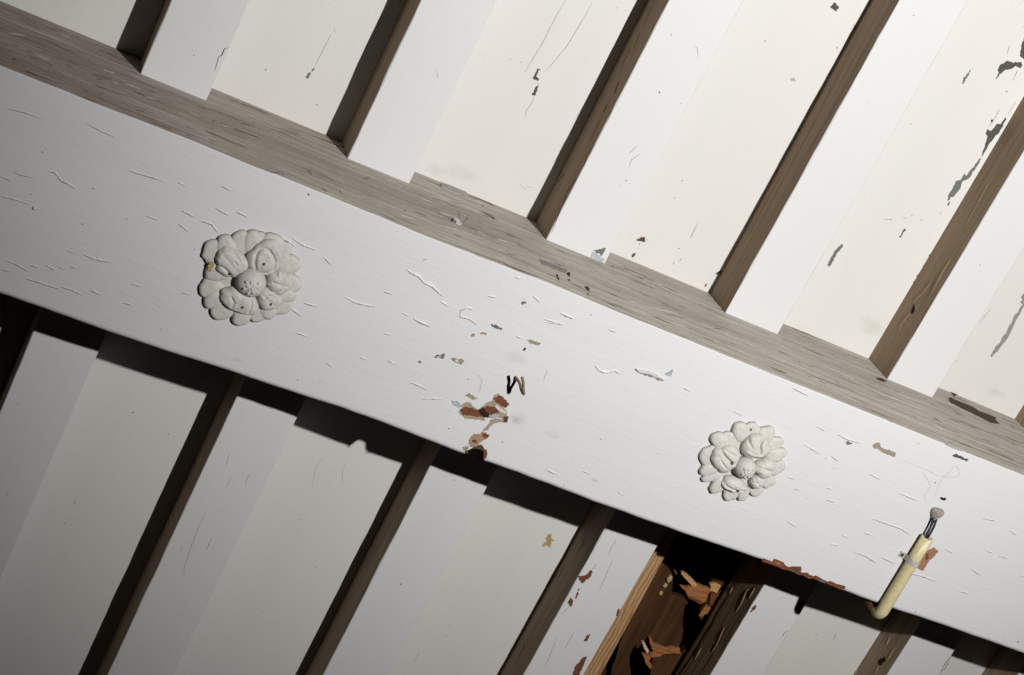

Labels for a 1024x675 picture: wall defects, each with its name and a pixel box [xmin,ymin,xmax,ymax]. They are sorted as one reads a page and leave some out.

peeling [996,40,1024,79]
peeling [947,118,1006,205]
peeling [452,393,509,462]
peeling [873,442,896,457]
peeling [568,570,593,607]
spalling [762,559,846,589]
peeling [573,656,587,675]